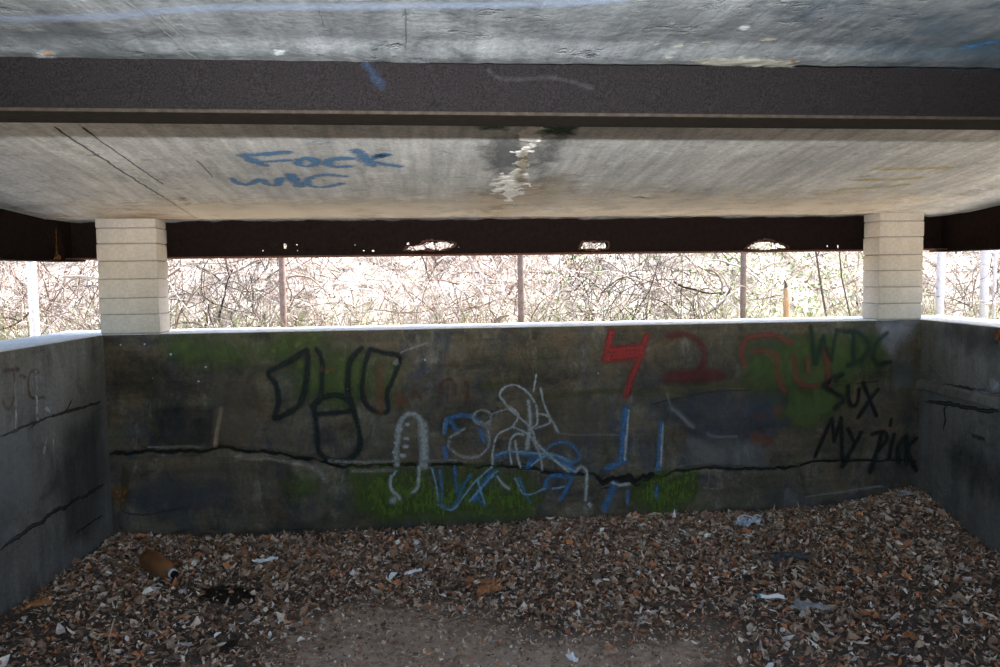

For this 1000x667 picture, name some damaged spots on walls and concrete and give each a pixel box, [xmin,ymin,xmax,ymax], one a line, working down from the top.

crack [55,127,197,218]
leakage [481,126,565,213]
crack [0,400,101,437]
crack [925,384,1000,430]
crack [109,429,918,489]
crack [0,484,187,551]